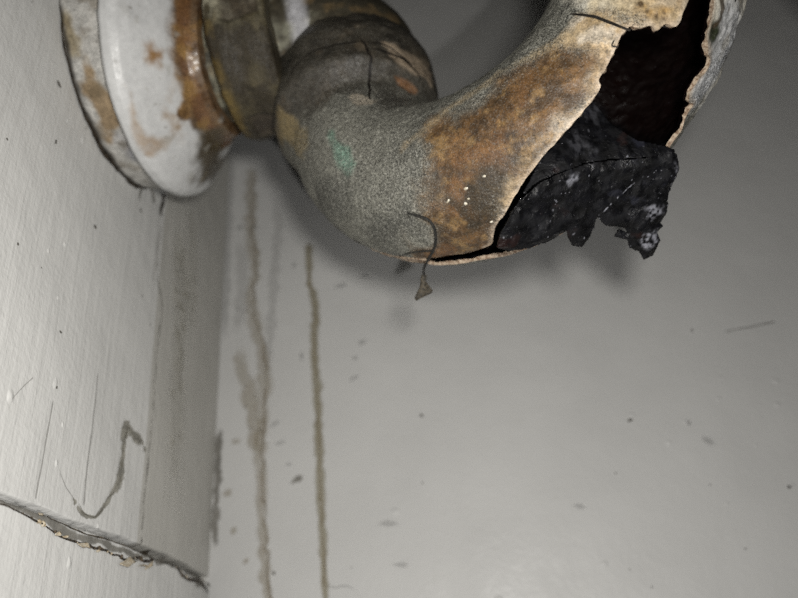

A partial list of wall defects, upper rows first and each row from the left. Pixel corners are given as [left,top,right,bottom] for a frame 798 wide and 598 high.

crack [0,500,210,593]